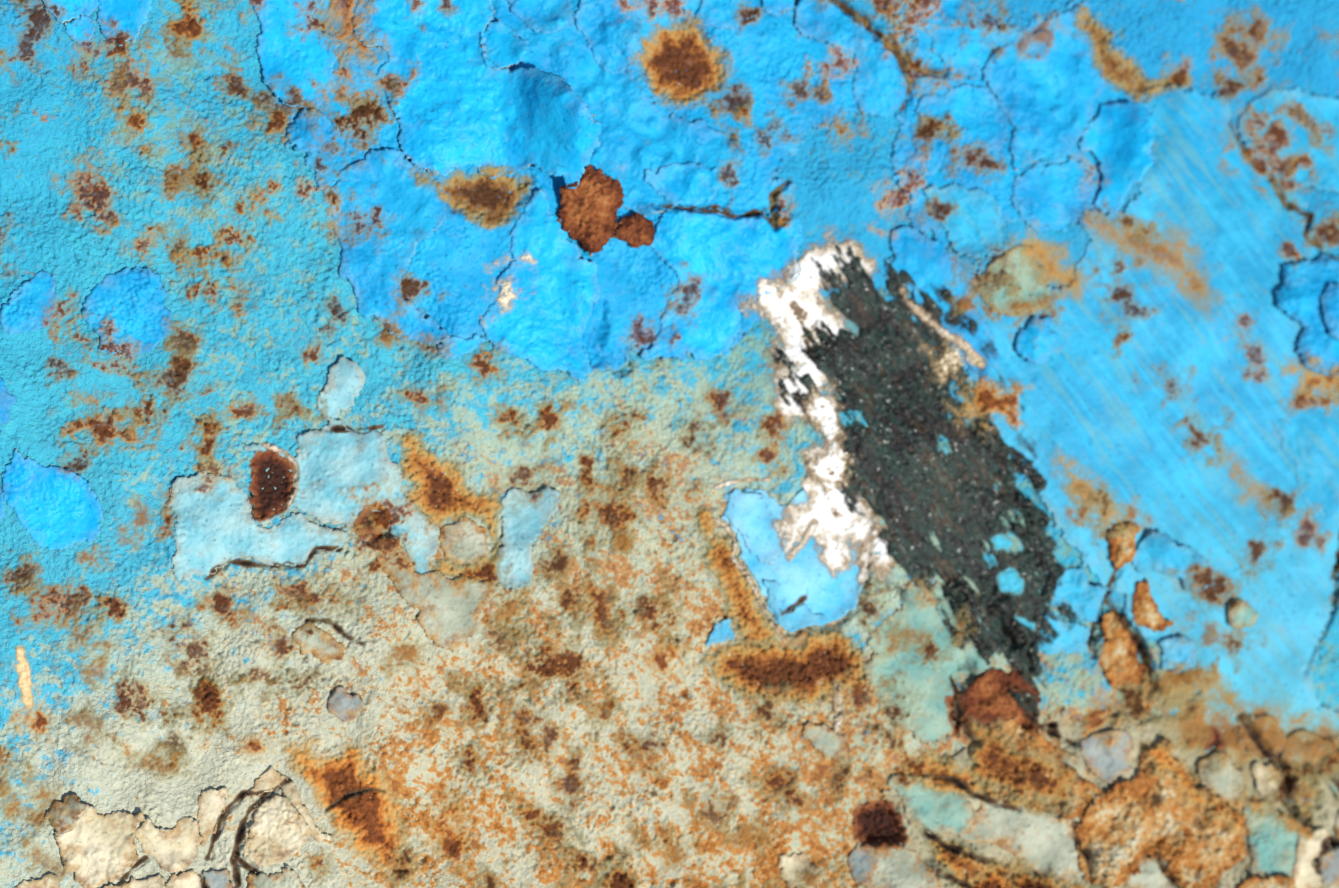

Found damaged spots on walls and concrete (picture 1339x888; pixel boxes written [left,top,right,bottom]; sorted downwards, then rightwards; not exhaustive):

peeling [254,0,341,110]
corrosion [620,0,791,149]
crack [1230,124,1339,261]
water stain [900,287,986,368]
peeling [166,357,562,653]
peeling [327,0,1339,888]
water stain [974,427,1064,603]
corrosion [425,455,686,777]
water stain [944,572,1046,720]
corrosion [686,508,1339,888]
crack [120,855,148,881]
crack [198,777,290,888]